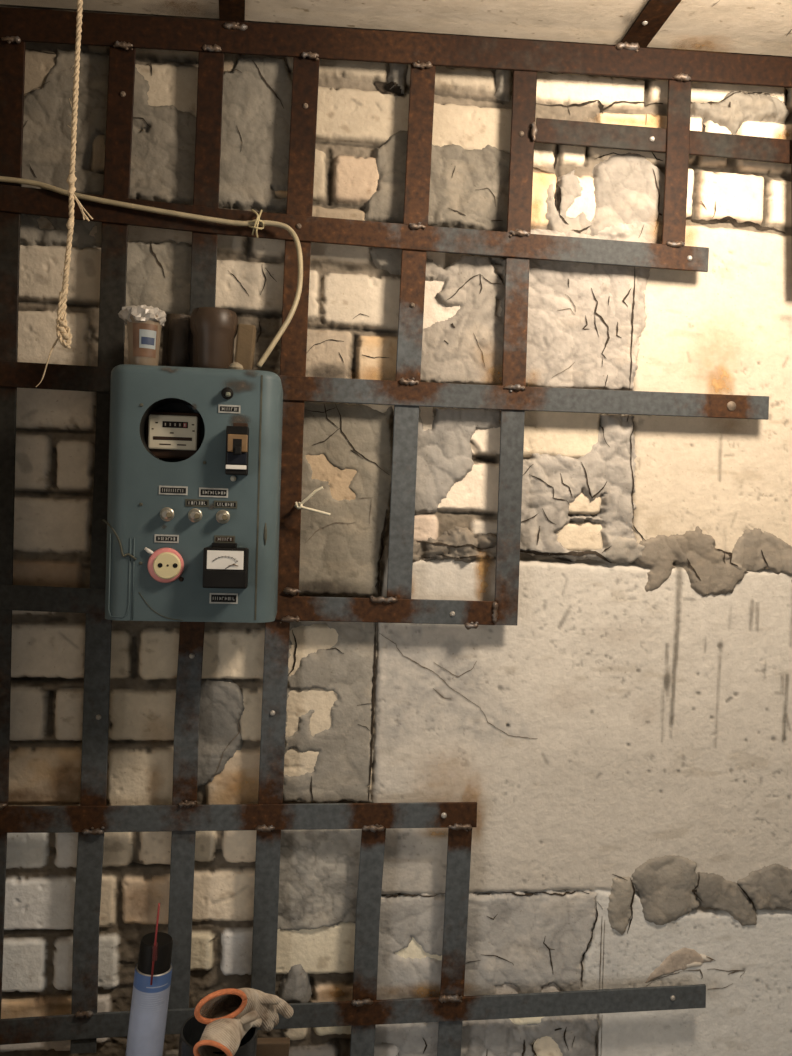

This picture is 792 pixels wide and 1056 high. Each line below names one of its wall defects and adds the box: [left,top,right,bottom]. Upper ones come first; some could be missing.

crack [536,75,663,125]
crack [533,145,590,233]
crack [639,152,785,237]
peeling [526,259,650,391]
crack [557,267,635,389]
peeling [520,414,637,564]
rust [478,557,490,597]
peeling [283,621,378,803]
crack [357,623,538,802]
water stain [665,610,680,723]
peeling [377,893,445,1000]
peeling [464,889,597,996]